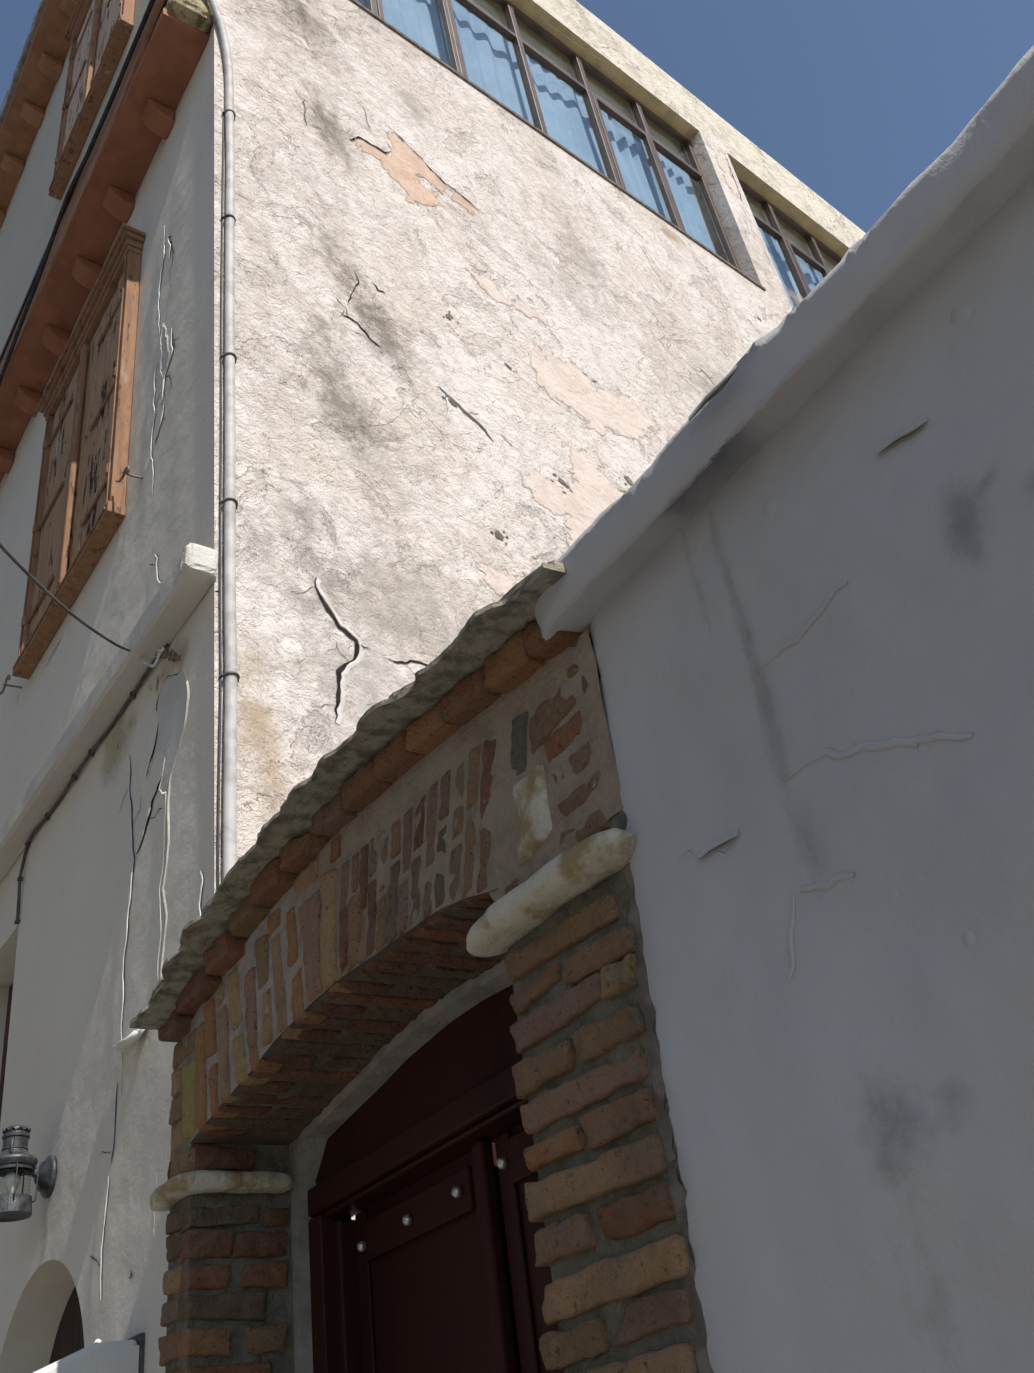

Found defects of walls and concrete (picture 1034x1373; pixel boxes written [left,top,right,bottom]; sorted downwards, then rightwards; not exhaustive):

peeling [349,127,479,216]
crack [150,225,179,496]
crack [291,577,428,725]
crack [90,740,163,1301]